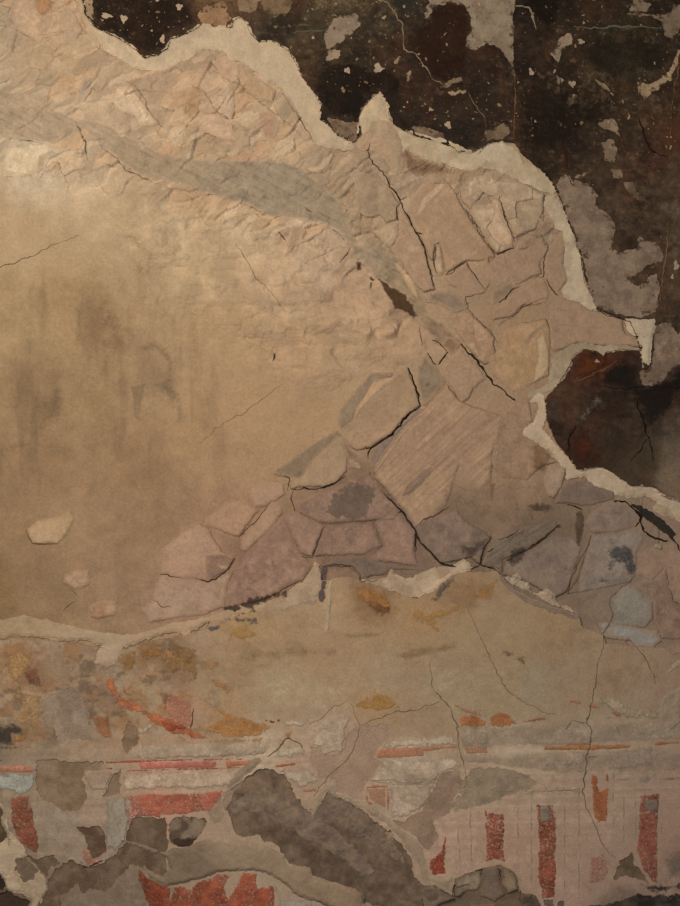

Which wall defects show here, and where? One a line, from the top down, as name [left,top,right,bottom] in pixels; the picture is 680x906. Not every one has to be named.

flaking render [324,13,361,61]
flaking render [424,0,516,76]
crack [368,144,558,342]
flaking render [555,169,663,318]
crack [419,326,515,401]
flaking render [639,322,680,387]
crack [367,368,421,455]
crack [384,494,581,572]
crack [614,500,680,551]
crack [467,580,632,856]
flaking render [226,723,536,906]
flaking render [0,815,207,906]